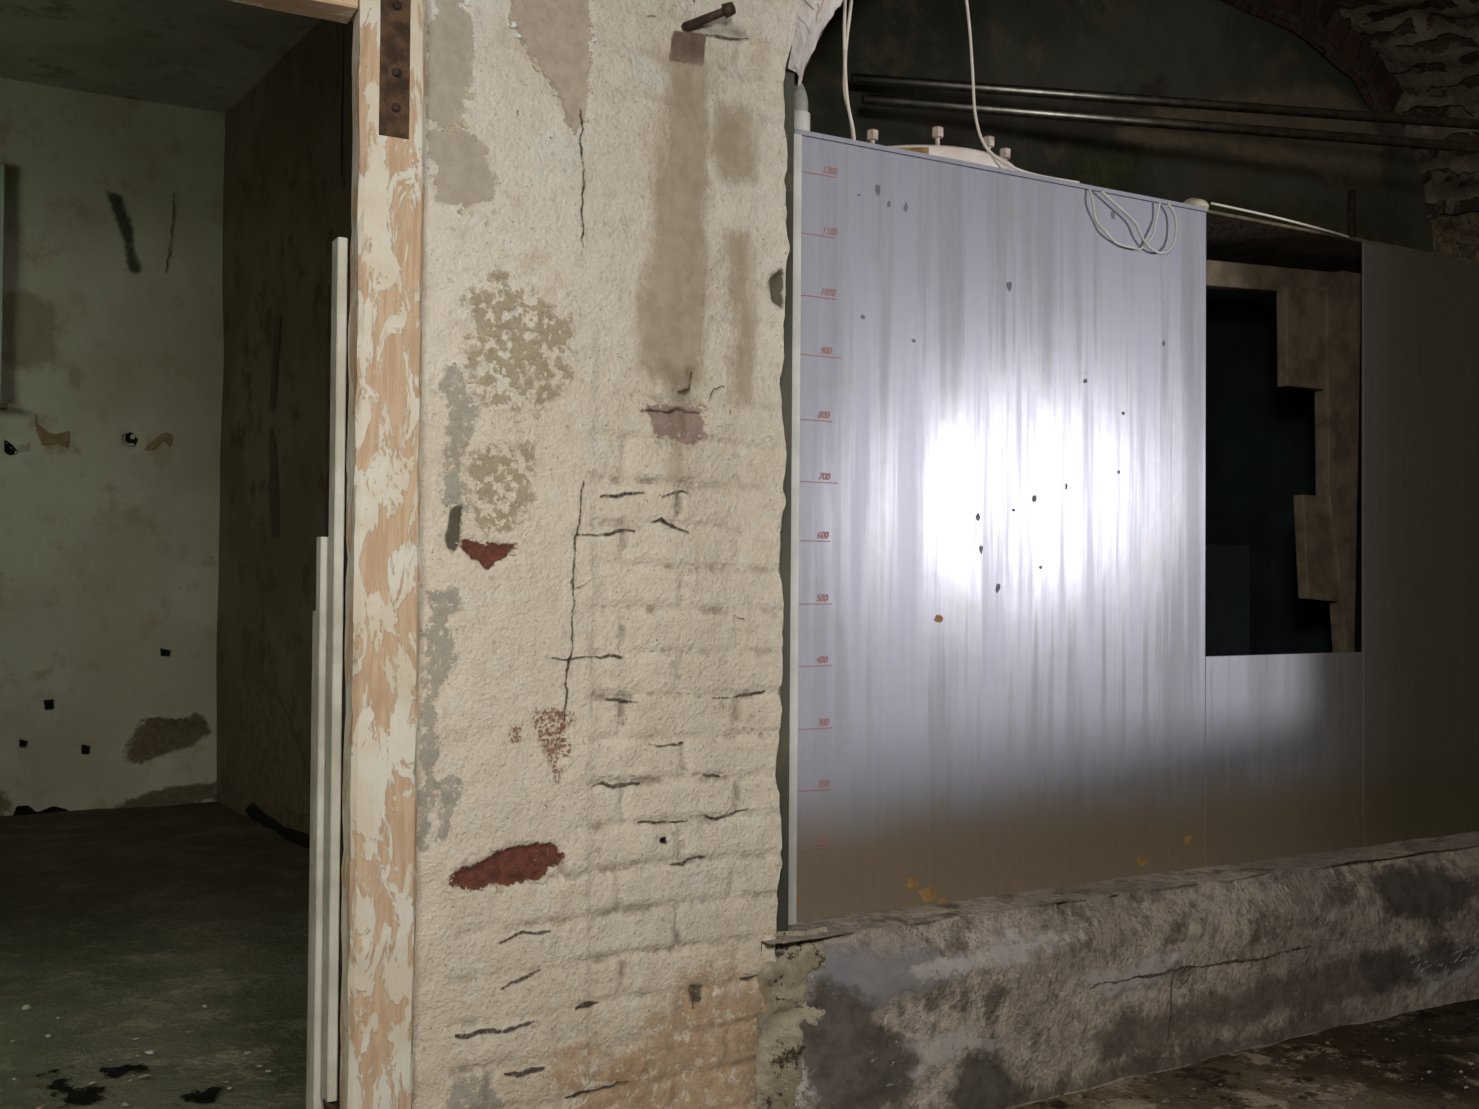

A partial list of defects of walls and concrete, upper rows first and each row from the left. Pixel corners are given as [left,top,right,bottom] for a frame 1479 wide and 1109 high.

peeling [507,0,597,135]
peeling [460,271,573,422]
peeling [445,441,536,570]
crack [551,481,690,720]
spalling [448,842,565,893]
crack [591,780,640,788]
crack [665,855,705,866]
crack [637,808,748,824]